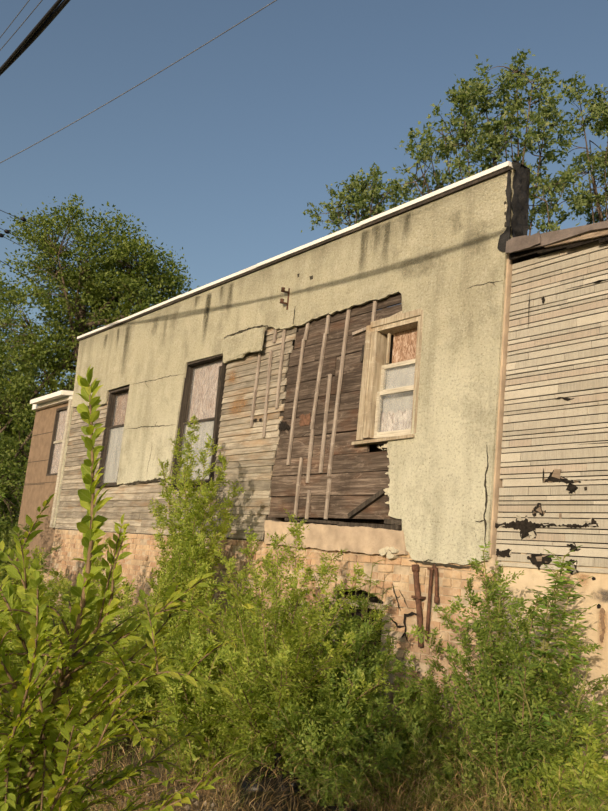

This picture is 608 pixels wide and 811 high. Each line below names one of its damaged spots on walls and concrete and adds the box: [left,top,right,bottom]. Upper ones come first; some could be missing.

leakage [361,222,390,258]
corrosion [597,604,606,642]